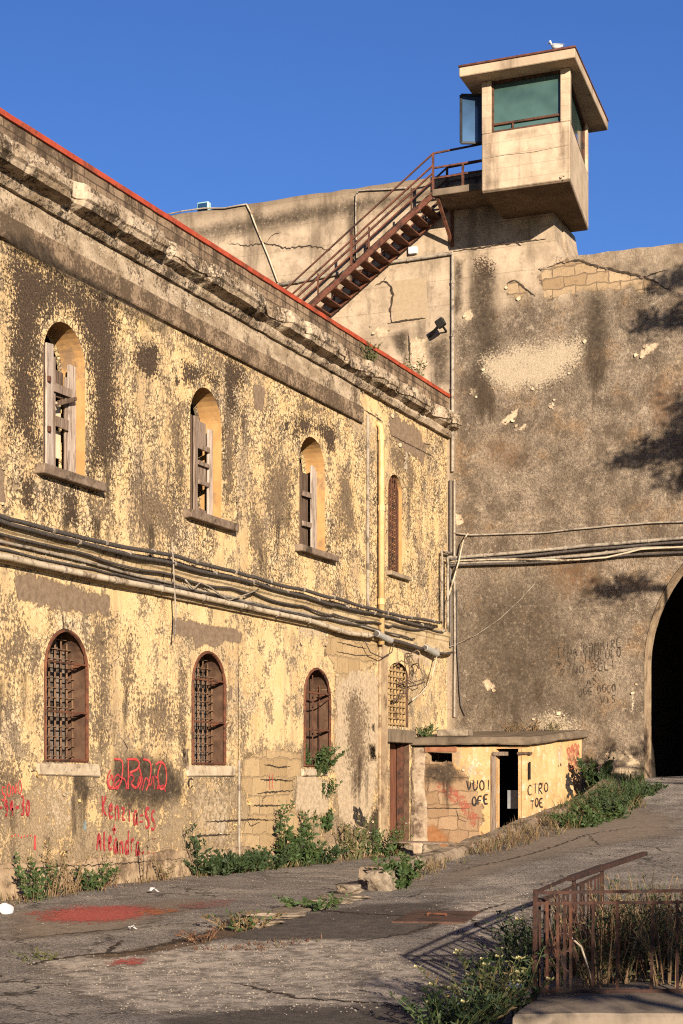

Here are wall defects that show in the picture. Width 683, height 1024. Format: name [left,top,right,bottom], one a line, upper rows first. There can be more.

crack [231,233,333,251]
peeling [169,281,220,319]
crack [376,277,425,363]
spalling [537,257,661,302]
crack [547,259,672,291]
leakage [1,235,265,556]
spalling [502,409,526,430]
spalling [186,625,379,851]
leakage [341,679,373,797]
spalling [410,748,486,853]
leakage [367,806,378,841]